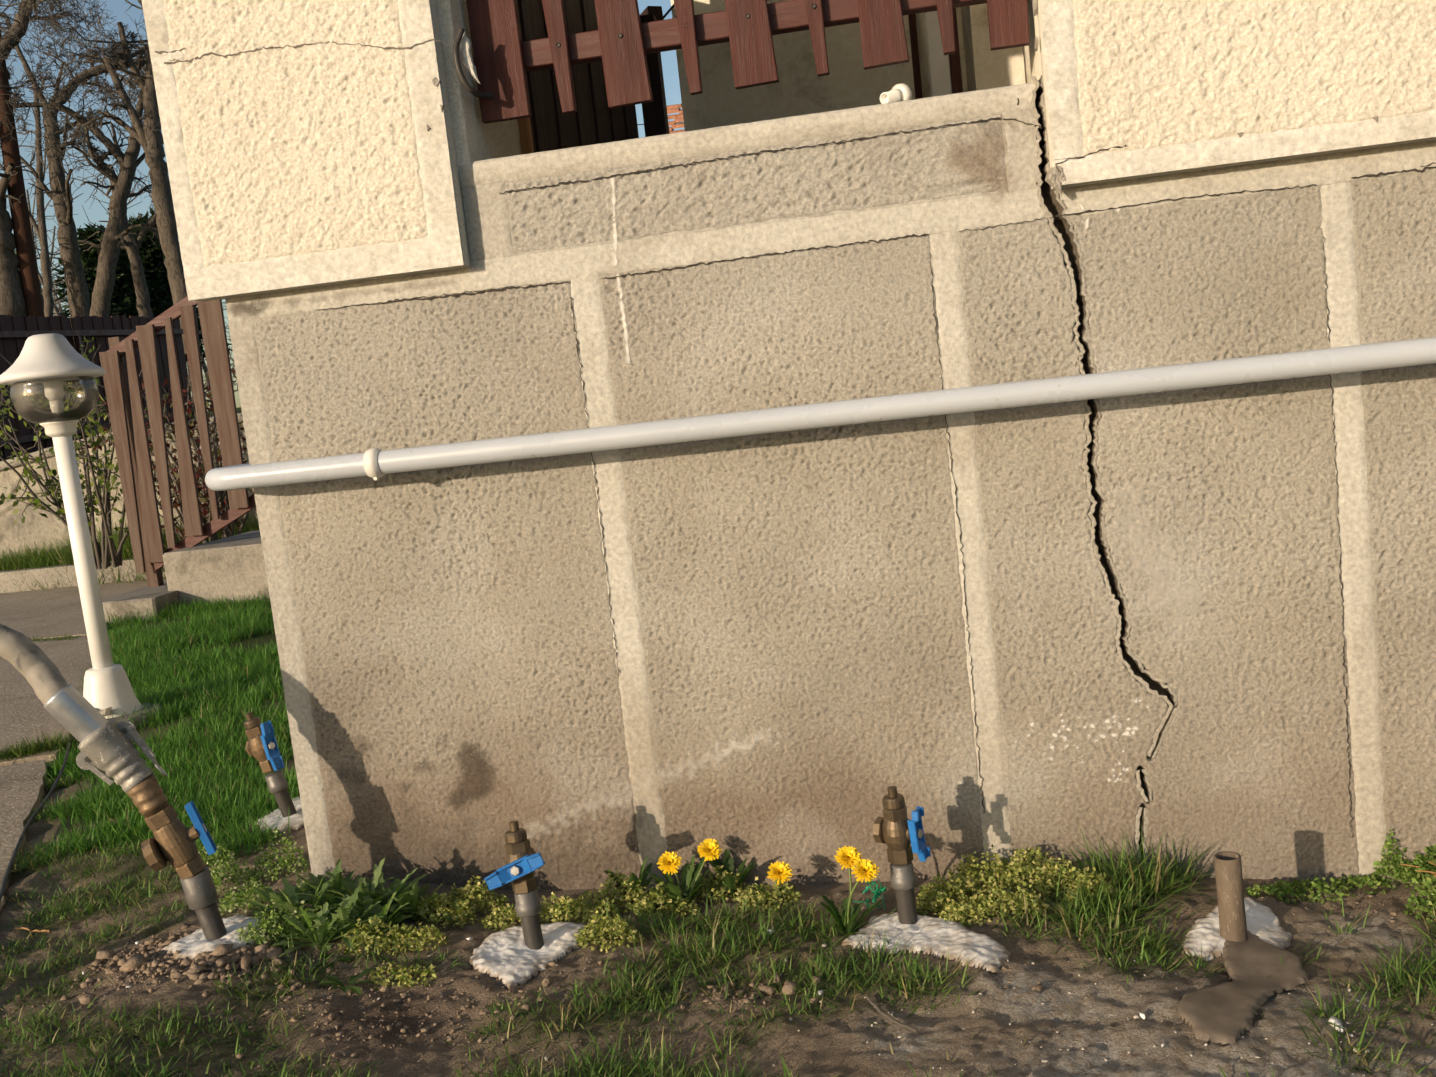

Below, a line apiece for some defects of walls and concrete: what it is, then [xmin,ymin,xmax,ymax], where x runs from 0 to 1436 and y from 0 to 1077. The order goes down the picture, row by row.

leakage [452,746,491,805]
crack [315,75,1316,863]
crack [1323,236,1354,838]
crack [1351,162,1436,178]